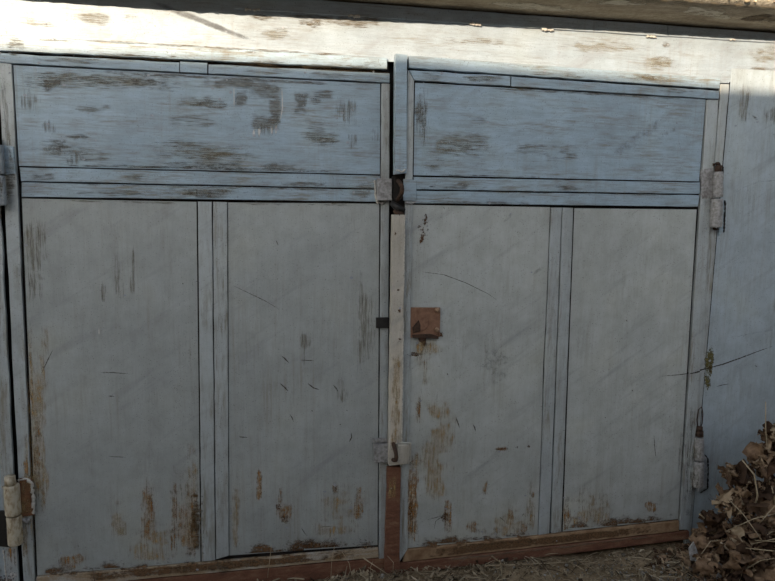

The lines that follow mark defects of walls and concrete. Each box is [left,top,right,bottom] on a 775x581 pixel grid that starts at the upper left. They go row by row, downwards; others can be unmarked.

peeling [28,73,161,90]
peeling [185,79,281,134]
corrosion [45,480,198,575]
corrosion [408,448,532,548]
corrosion [562,498,661,530]